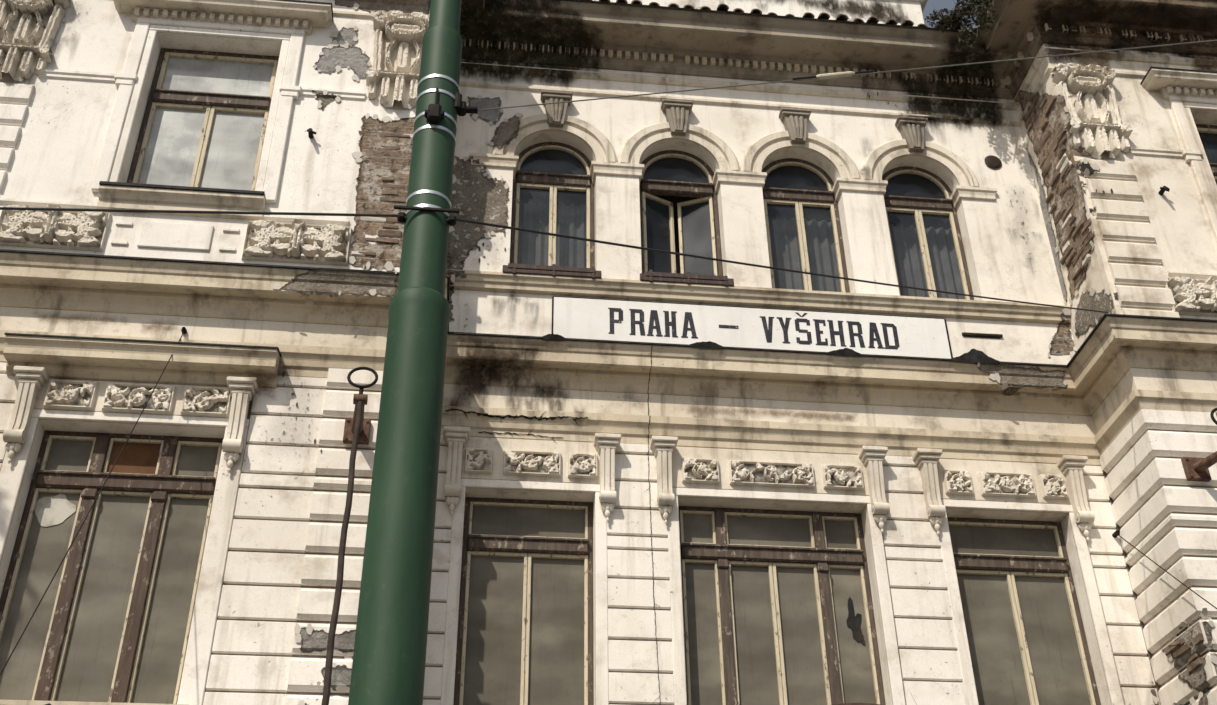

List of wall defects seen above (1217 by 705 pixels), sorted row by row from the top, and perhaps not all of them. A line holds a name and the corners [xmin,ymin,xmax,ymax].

spalling [313,25,371,82]
spalling [335,0,431,17]
water stain [459,0,600,87]
water stain [799,0,906,24]
water stain [861,36,1004,128]
spalling [348,113,415,274]
spalling [446,156,510,322]
spalling [1014,88,1118,358]
water stain [457,318,563,408]
crack [446,408,588,440]
spalling [294,623,356,692]
spalling [1151,607,1217,705]